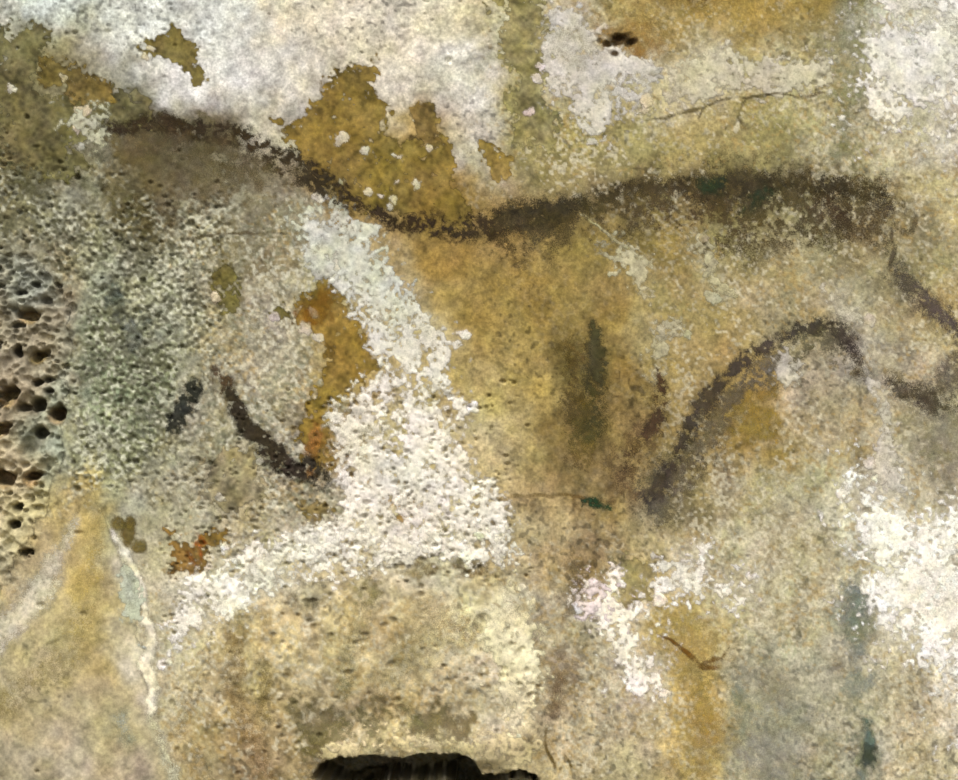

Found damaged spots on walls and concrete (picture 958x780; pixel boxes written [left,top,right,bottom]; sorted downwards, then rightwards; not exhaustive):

crack [656,92,824,123]